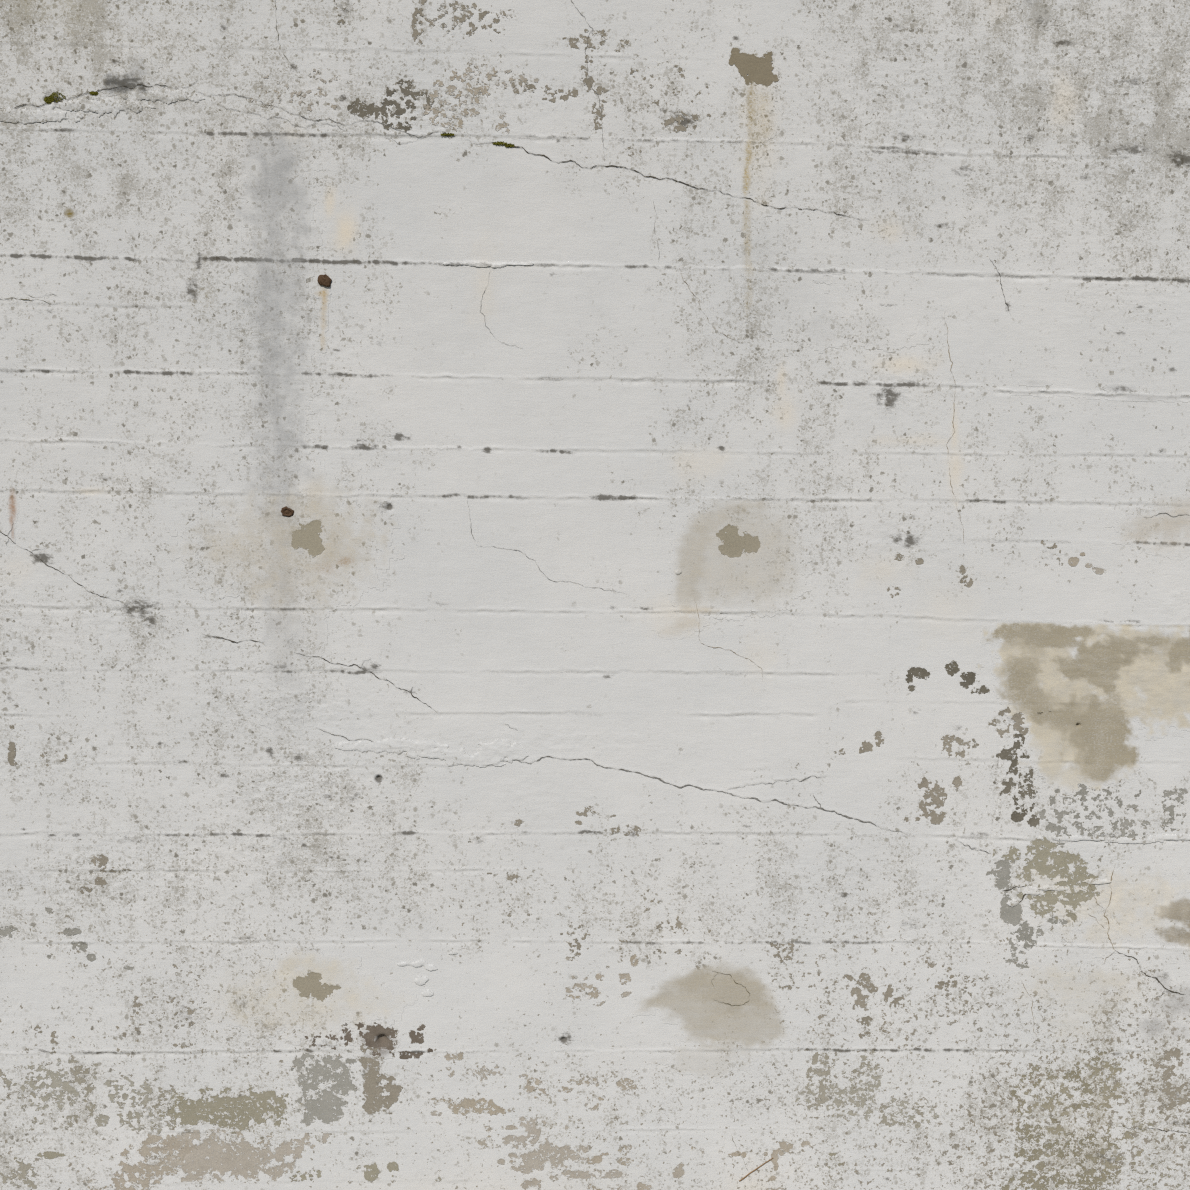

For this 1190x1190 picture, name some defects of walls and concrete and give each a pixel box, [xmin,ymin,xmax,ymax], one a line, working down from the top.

peeling [411,0,513,44]
peeling [249,29,630,132]
crack [481,0,859,249]
crack [1,524,119,601]
water stain [668,497,816,626]
crack [301,654,430,707]
crack [487,756,902,832]
peeling [986,707,1188,969]
peeling [0,1022,502,1190]
peeling [430,1097,642,1190]
peeling [519,1071,636,1130]
peeling [1001,1048,1190,1190]